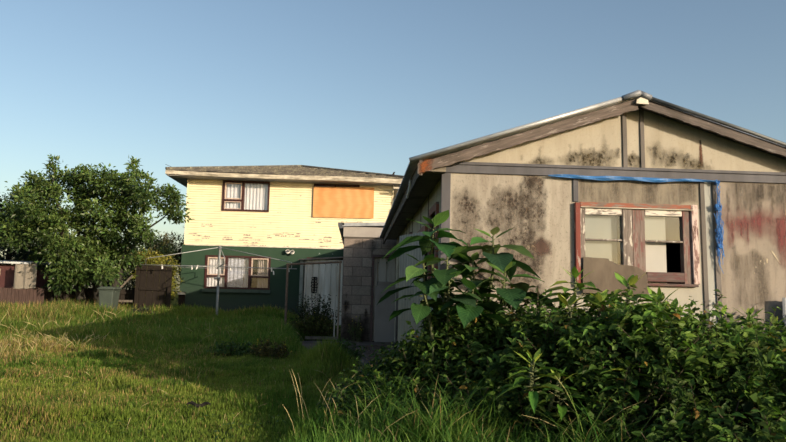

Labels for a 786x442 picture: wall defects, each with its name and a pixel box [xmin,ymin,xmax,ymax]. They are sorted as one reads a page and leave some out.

water stain [569,151,612,166]
peeling [243,225,343,247]
water stain [456,175,550,292]